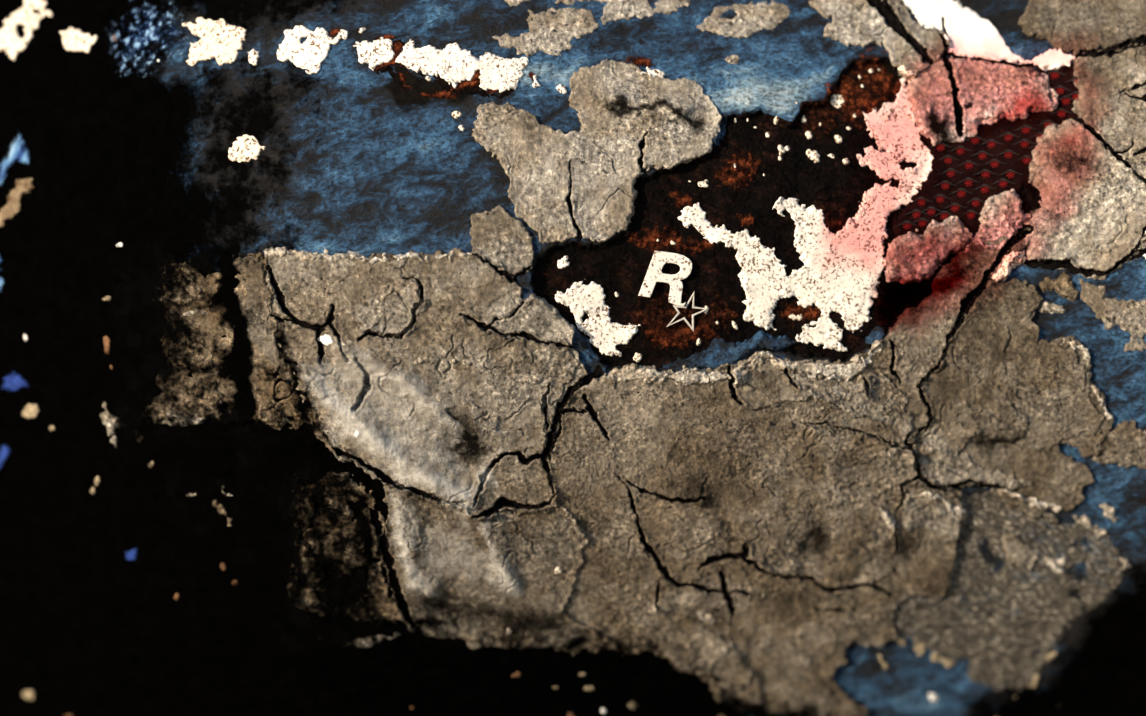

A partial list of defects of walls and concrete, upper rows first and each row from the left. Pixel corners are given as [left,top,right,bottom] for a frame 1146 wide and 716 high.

peeling [0,0,53,60]
peeling [60,4,260,71]
peeling [277,25,541,131]
peeling [228,134,266,163]
crack [1073,116,1146,183]
crack [266,265,424,411]
crack [459,253,573,348]
spalling [531,50,934,385]
crack [809,224,1146,543]
spalling [990,227,1029,282]
crack [326,364,609,518]
crack [618,476,894,626]